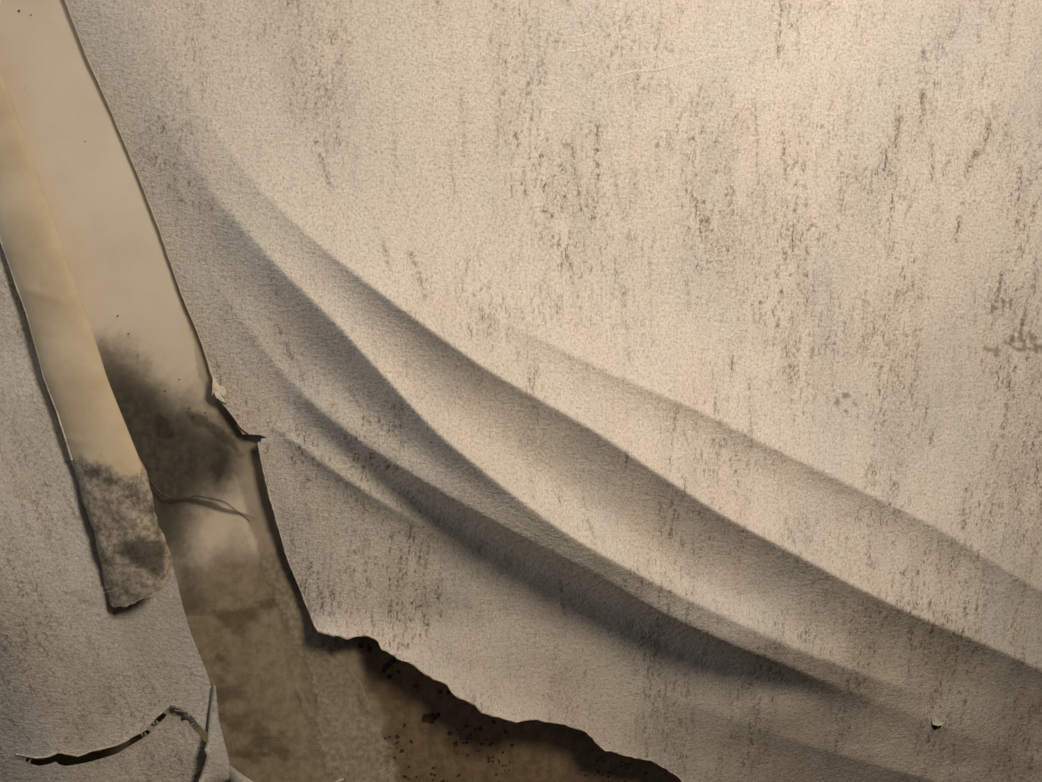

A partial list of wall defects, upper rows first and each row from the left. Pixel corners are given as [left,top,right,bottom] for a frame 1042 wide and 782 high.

damp [70,351,337,782]
peeling [212,376,227,403]